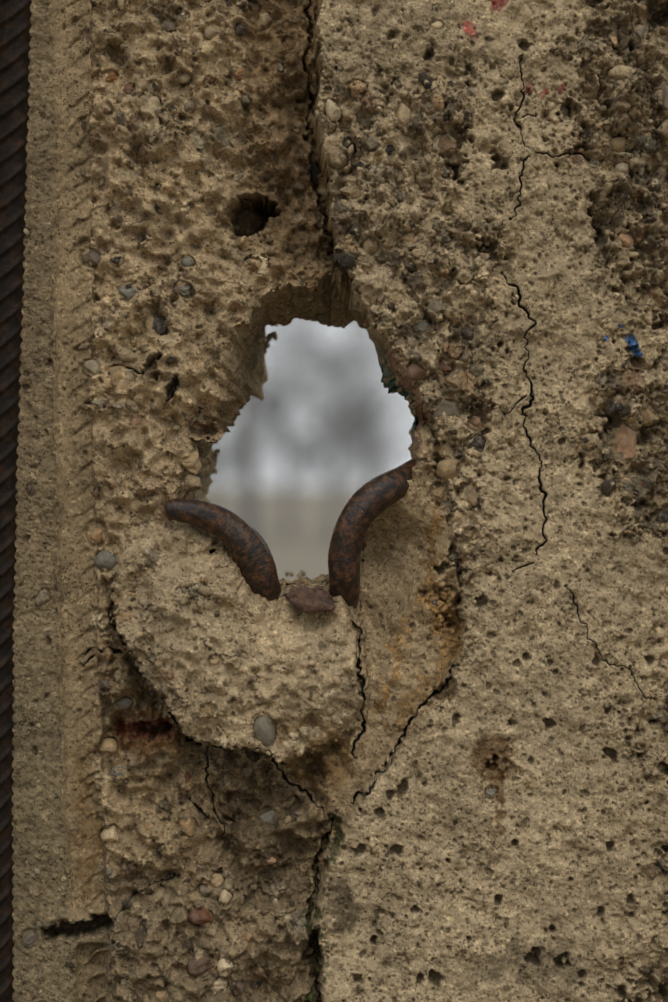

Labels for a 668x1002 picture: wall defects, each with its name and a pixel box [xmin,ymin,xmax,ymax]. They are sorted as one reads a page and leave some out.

crack [299,0,342,257]
crack [510,55,591,221]
spalling [37,0,515,1002]
crack [500,272,551,574]
crack [82,595,459,1002]